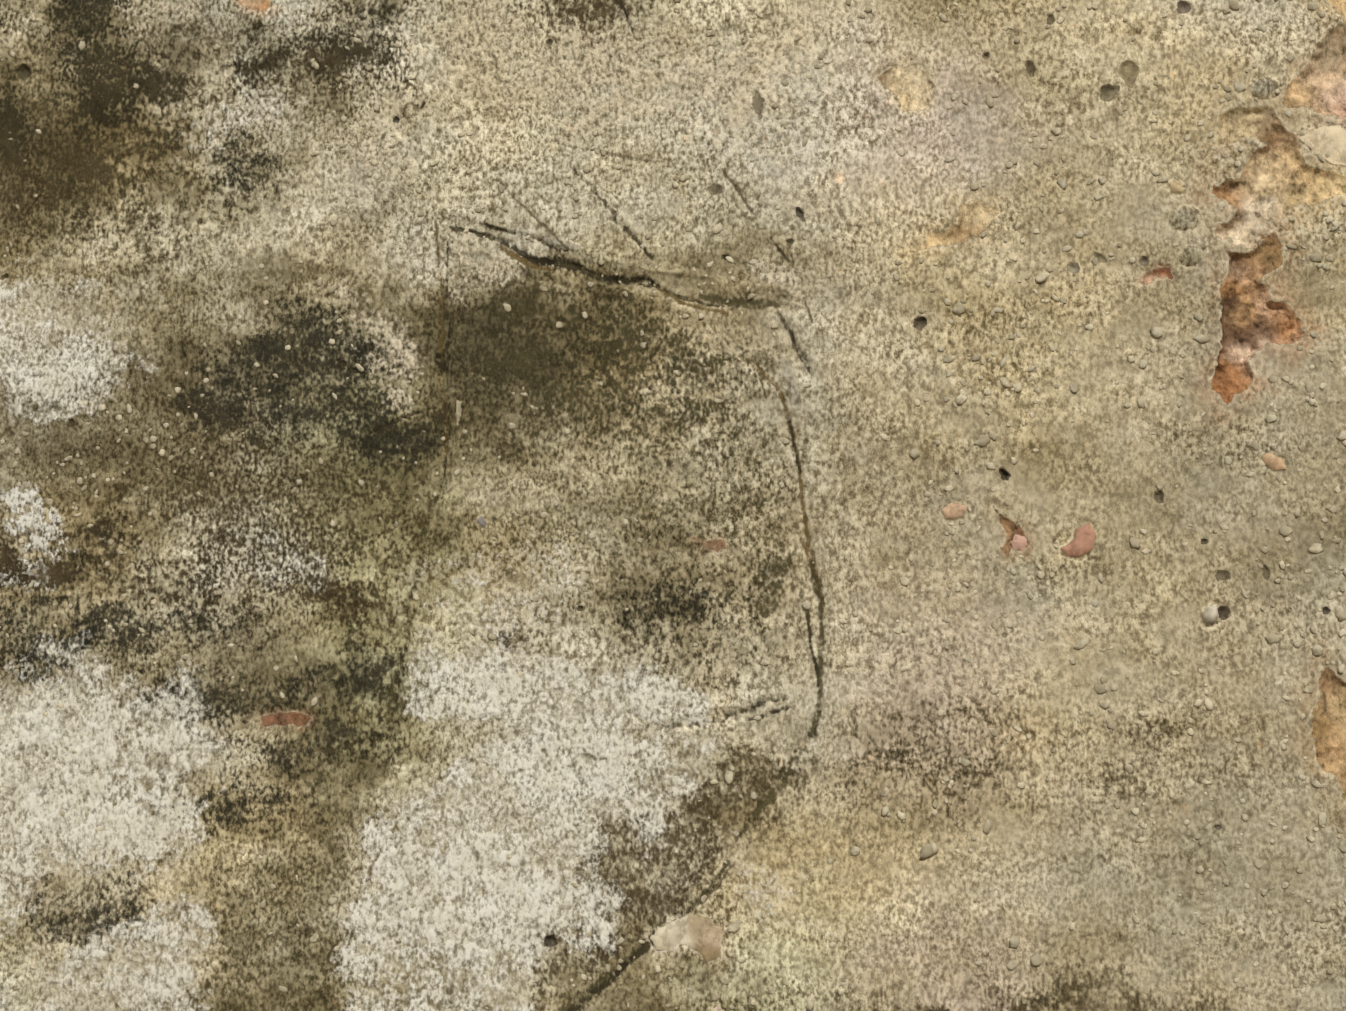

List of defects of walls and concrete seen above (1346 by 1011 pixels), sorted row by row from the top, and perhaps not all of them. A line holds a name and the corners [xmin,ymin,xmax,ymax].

leakage [0,0,412,232]
crack [338,359,367,374]
leakage [443,222,756,454]
leakage [435,0,811,148]
leakage [751,260,801,302]
spalling [1192,0,1346,405]
crack [298,647,407,763]
leakage [0,278,813,1011]
crack [369,220,825,1011]
spalling [1311,667,1346,802]